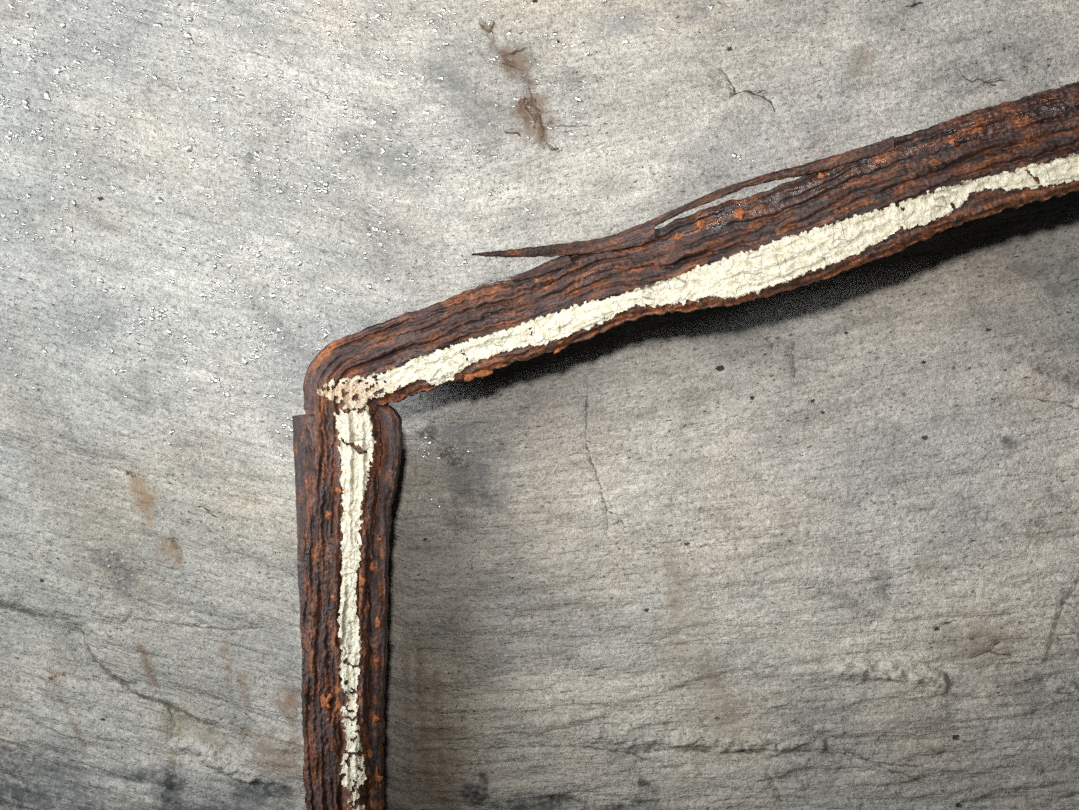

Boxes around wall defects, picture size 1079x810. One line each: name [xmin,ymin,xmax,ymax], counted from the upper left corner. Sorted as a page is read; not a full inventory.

rust [479,22,528,71]
rust [292,81,1079,810]
crack [66,618,212,725]